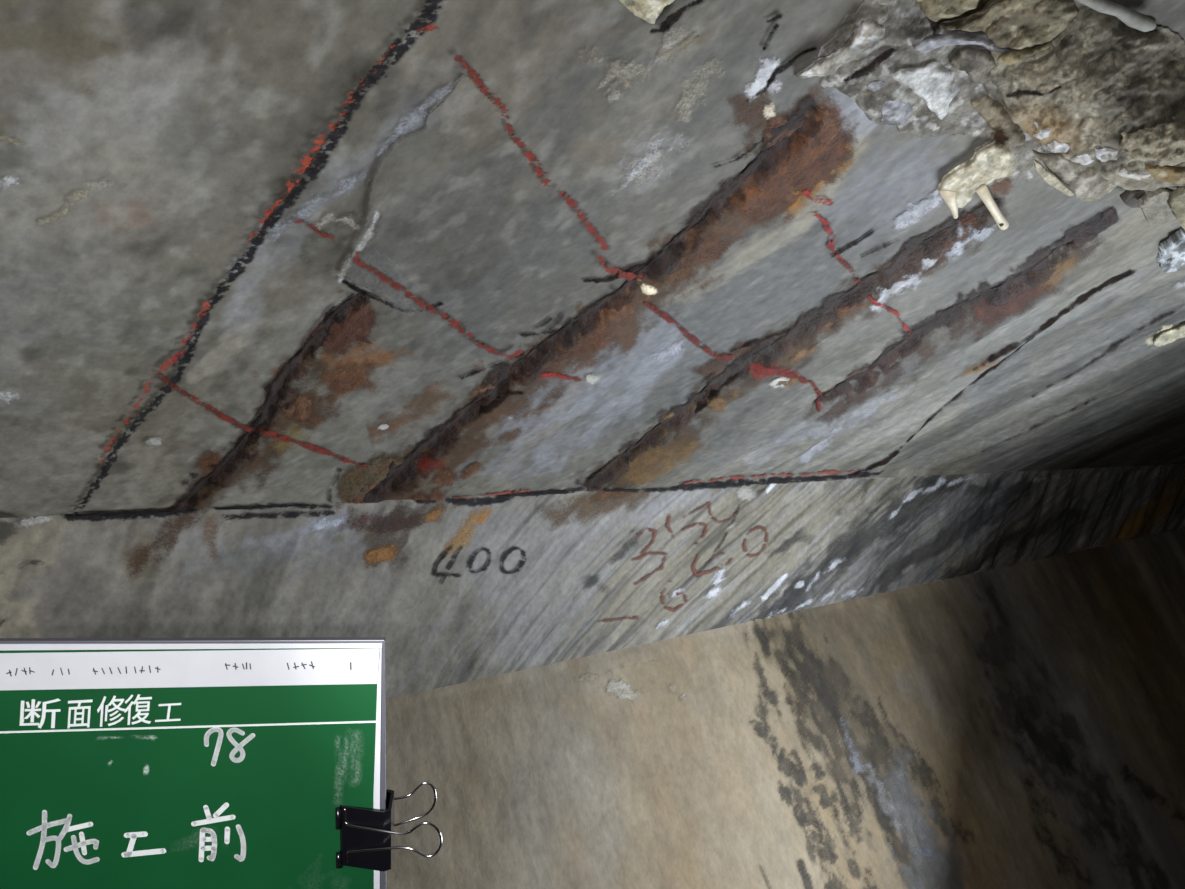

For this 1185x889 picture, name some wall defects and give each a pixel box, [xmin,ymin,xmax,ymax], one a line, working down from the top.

crack [297,278,443,355]
crack [461,362,523,416]
corrosion [336,88,854,567]
crack [584,234,680,283]
corrosion [543,198,1006,528]
crack [832,231,894,258]
spalling [814,208,1118,405]
corrosion [949,242,1103,341]
corrosion [130,336,395,574]
leakage [312,517,344,531]
leakage [706,569,724,598]
leakage [733,475,1060,889]